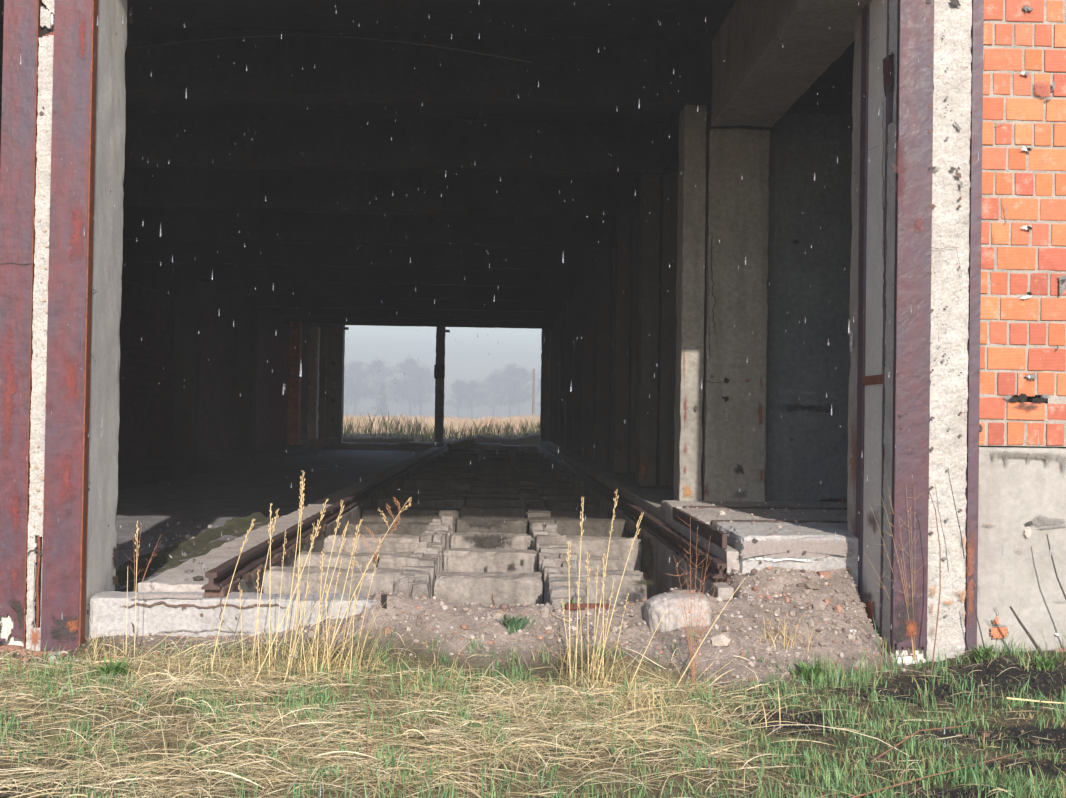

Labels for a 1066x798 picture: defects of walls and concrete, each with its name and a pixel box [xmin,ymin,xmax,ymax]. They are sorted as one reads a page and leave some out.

spalling [43,6,54,36]
hole [1004,393,1050,410]